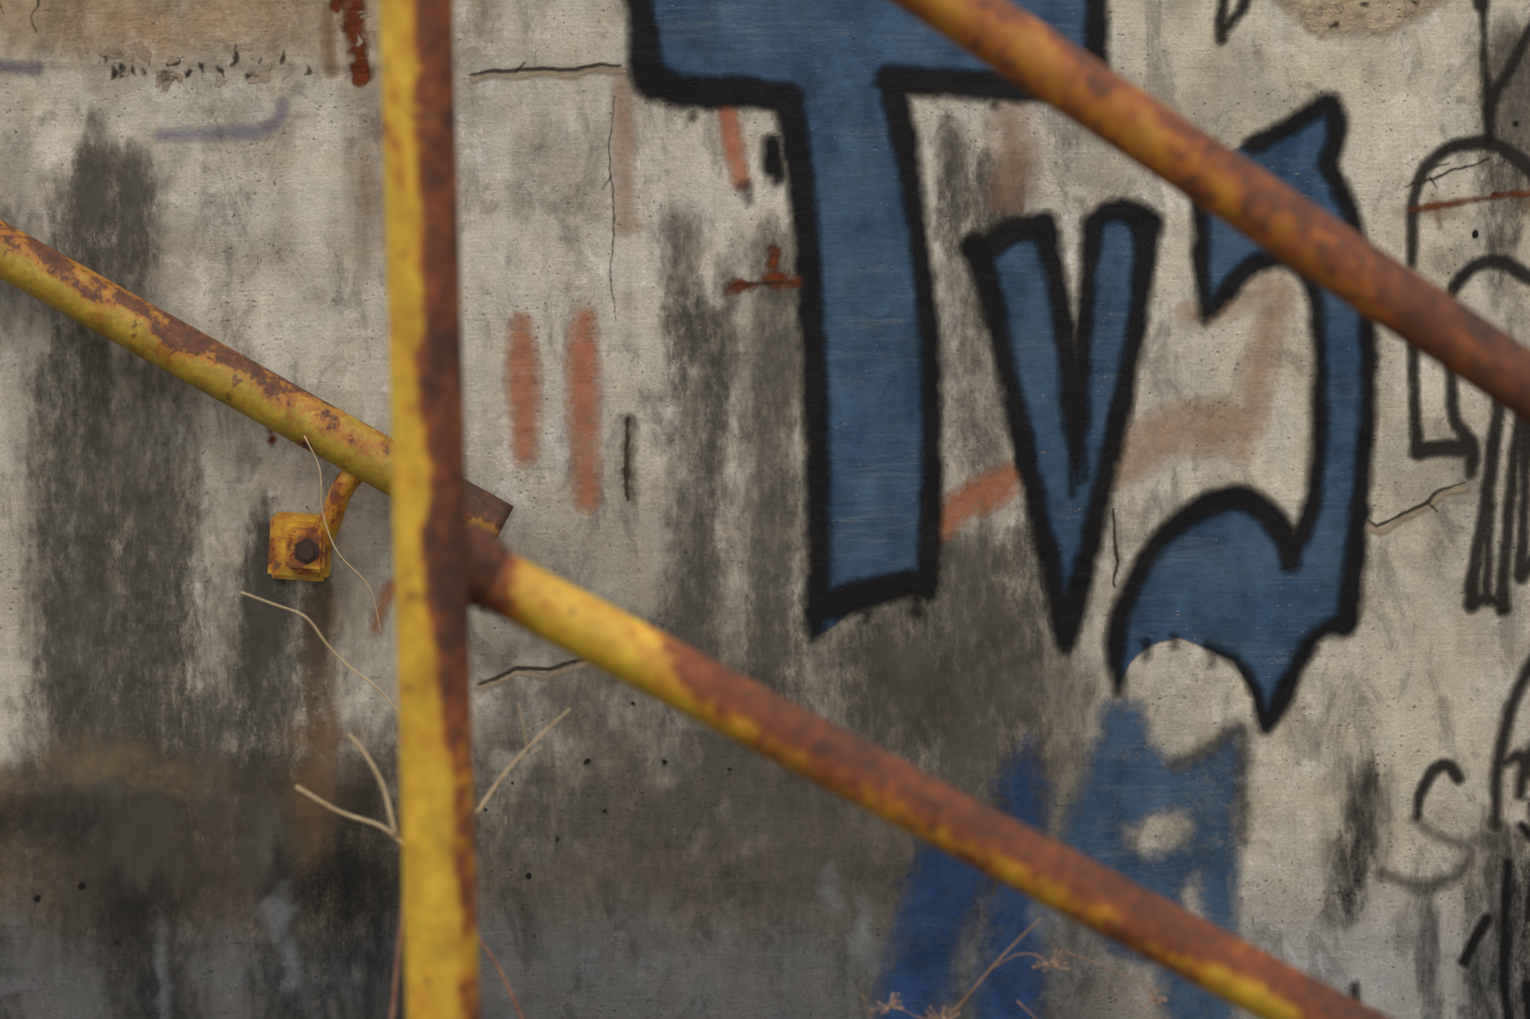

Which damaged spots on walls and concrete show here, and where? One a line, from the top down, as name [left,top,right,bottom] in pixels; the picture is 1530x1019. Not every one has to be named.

peeling [99,0,311,91]
rust [326,0,371,86]
peeling [1280,0,1442,37]
damp [54,115,163,298]
crack [470,62,624,309]
crack [1367,482,1468,534]
damp [0,327,407,1019]